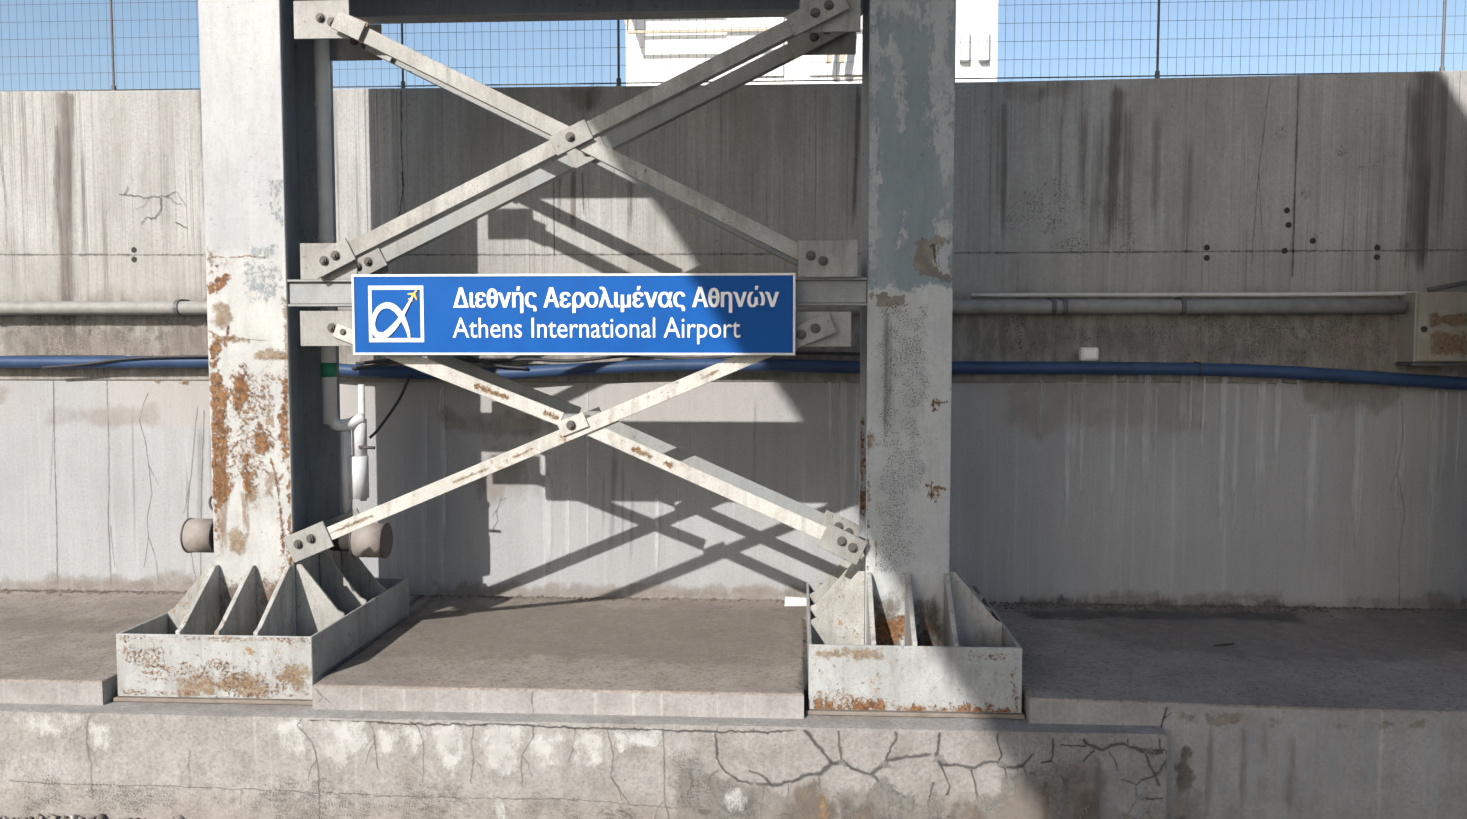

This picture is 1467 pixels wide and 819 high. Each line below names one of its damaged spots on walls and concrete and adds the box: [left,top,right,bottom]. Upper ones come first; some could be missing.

water stain [7,92,208,355]
crack [120,186,187,228]
peeling [868,0,956,307]
water stain [1108,87,1123,228]
water stain [1406,73,1445,263]
corrosion [207,251,292,606]
corrosion [860,418,877,570]
corrosion [119,635,310,698]
corrosion [219,576,242,617]
corrosion [812,653,1018,713]
crack [310,707,1171,819]
water stain [1175,746,1193,792]